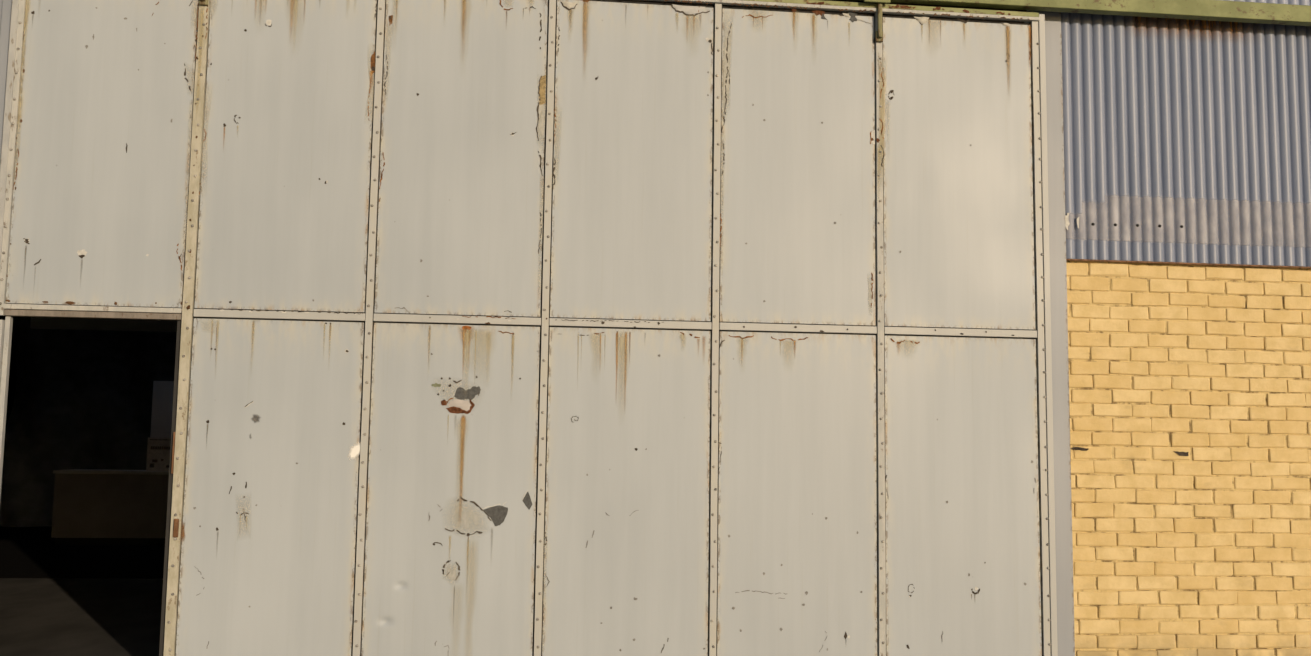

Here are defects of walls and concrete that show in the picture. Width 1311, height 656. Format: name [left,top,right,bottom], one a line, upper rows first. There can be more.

rust [581,332,627,377]
peeling [432,376,481,414]
rust [448,416,465,487]
peeling [433,497,508,580]